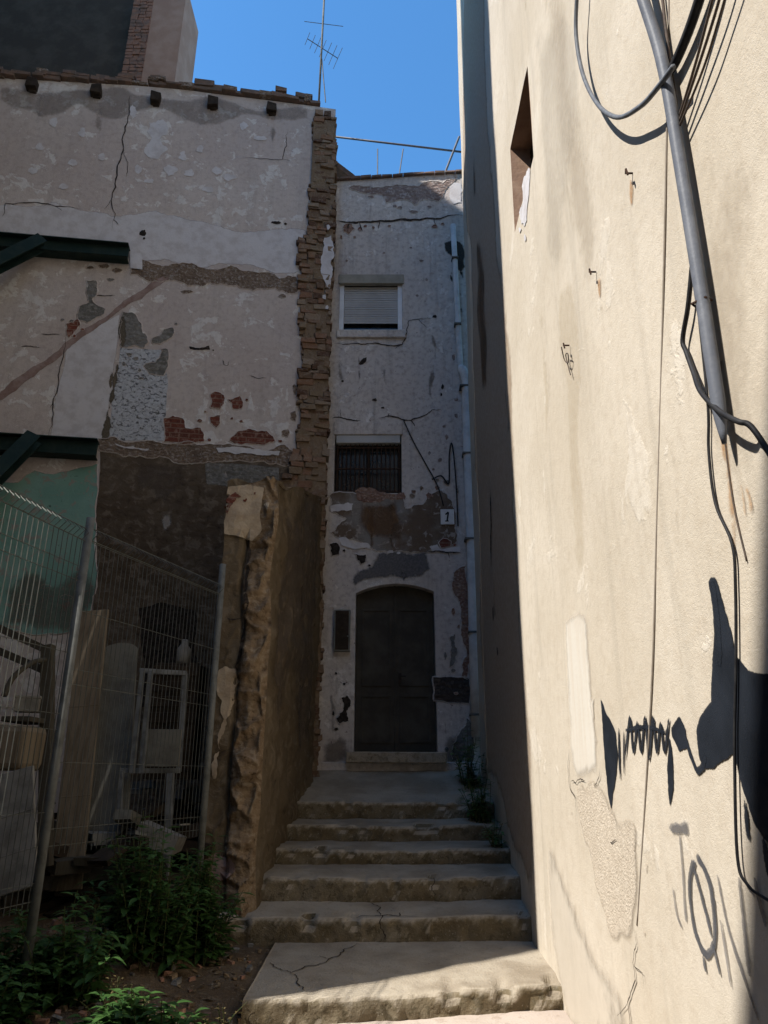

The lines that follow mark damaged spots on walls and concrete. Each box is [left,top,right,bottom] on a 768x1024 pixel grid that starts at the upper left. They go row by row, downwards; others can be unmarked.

crack [106,97,130,224]
crack [3,202,74,215]
crack [340,214,459,230]
flaking render [60,259,300,338]
flaking render [329,451,459,567]
flaking render [0,311,297,813]
flaking render [331,671,352,731]
flaking render [576,781,647,939]
crack [351,903,401,938]
crack [272,945,355,989]